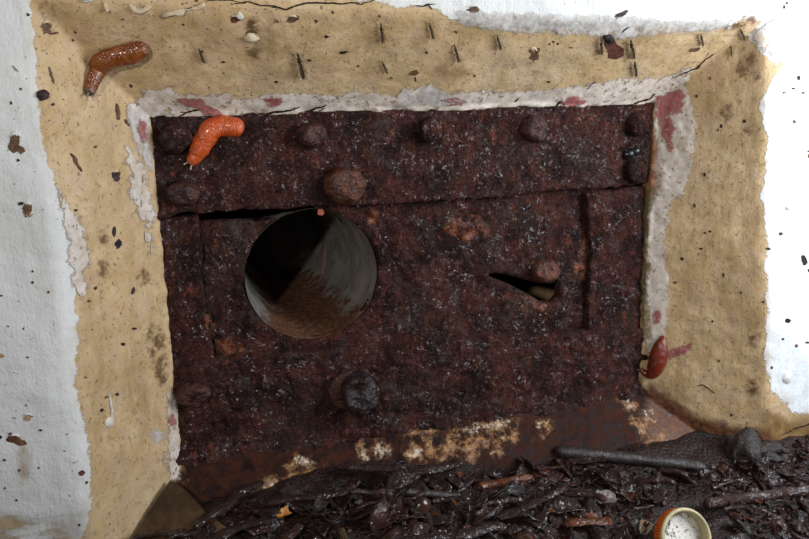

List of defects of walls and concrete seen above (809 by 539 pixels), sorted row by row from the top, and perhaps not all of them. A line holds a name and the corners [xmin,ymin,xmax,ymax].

peeling [40,21,59,35]
peeling [160,0,206,26]
spalling [230,12,260,58]
crack [208,0,373,10]
peeling [454,5,732,62]
peeling [753,18,780,57]
peeling [36,89,55,106]
peeling [56,183,97,303]
rust [444,218,487,241]
peeling [668,343,693,360]
peeling [151,389,184,480]
rust [173,384,742,502]